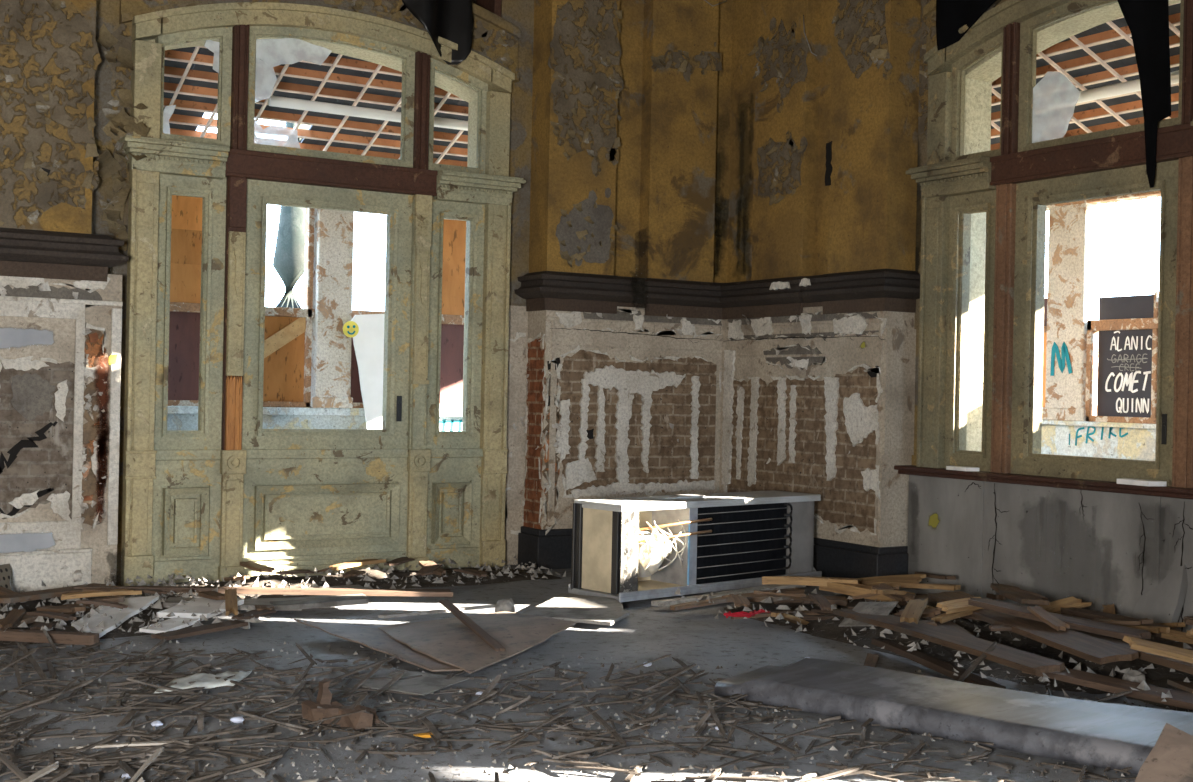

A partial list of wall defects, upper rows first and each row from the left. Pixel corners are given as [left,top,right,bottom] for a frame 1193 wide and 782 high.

spalling [0,276,110,308]
crack [0,421,58,474]
flaking render [0,322,107,531]
flaking render [505,309,887,535]
crack [0,488,54,516]